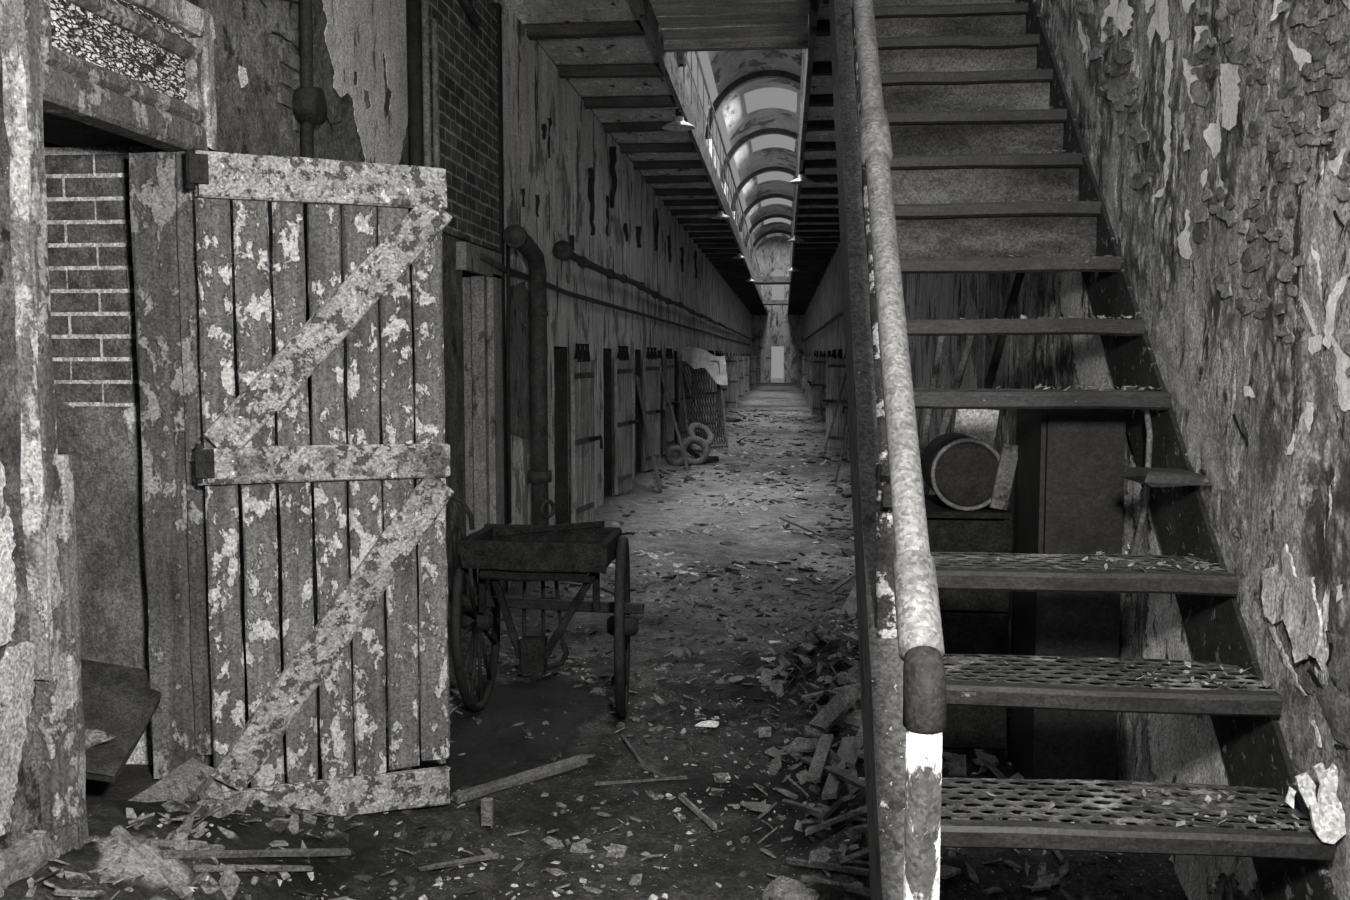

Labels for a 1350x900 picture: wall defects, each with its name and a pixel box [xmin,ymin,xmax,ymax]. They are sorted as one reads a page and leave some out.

peeling [1071,0,1350,412]
flaking render [1056,272,1094,318]
peeling [1286,402,1314,455]
flaking render [1122,454,1166,567]
spalling [1278,622,1319,694]